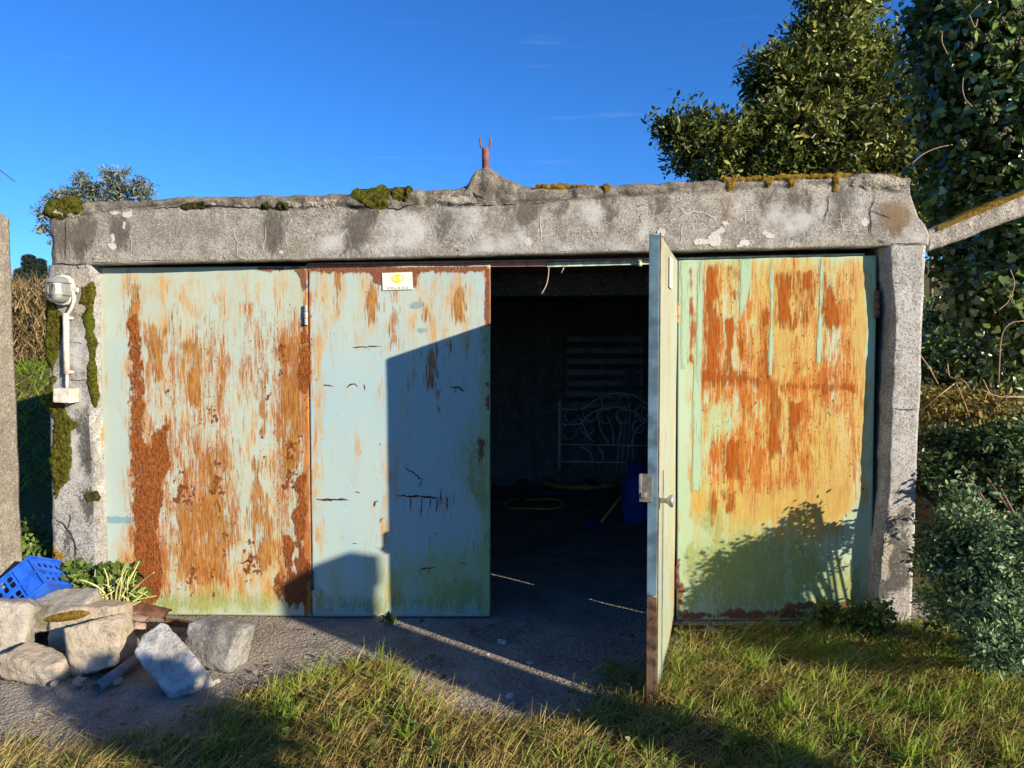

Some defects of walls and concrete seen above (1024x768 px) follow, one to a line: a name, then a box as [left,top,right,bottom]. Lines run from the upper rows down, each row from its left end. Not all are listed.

damp [54,218,97,269]
damp [111,217,130,249]
damp [264,212,285,251]
damp [321,205,484,253]
peeling [693,221,729,247]
rust [258,266,490,350]
rust [421,341,452,413]
rust [689,266,855,459]
damp [71,392,94,521]
rust [123,280,312,609]
rust [711,491,736,526]
rust [677,558,866,619]